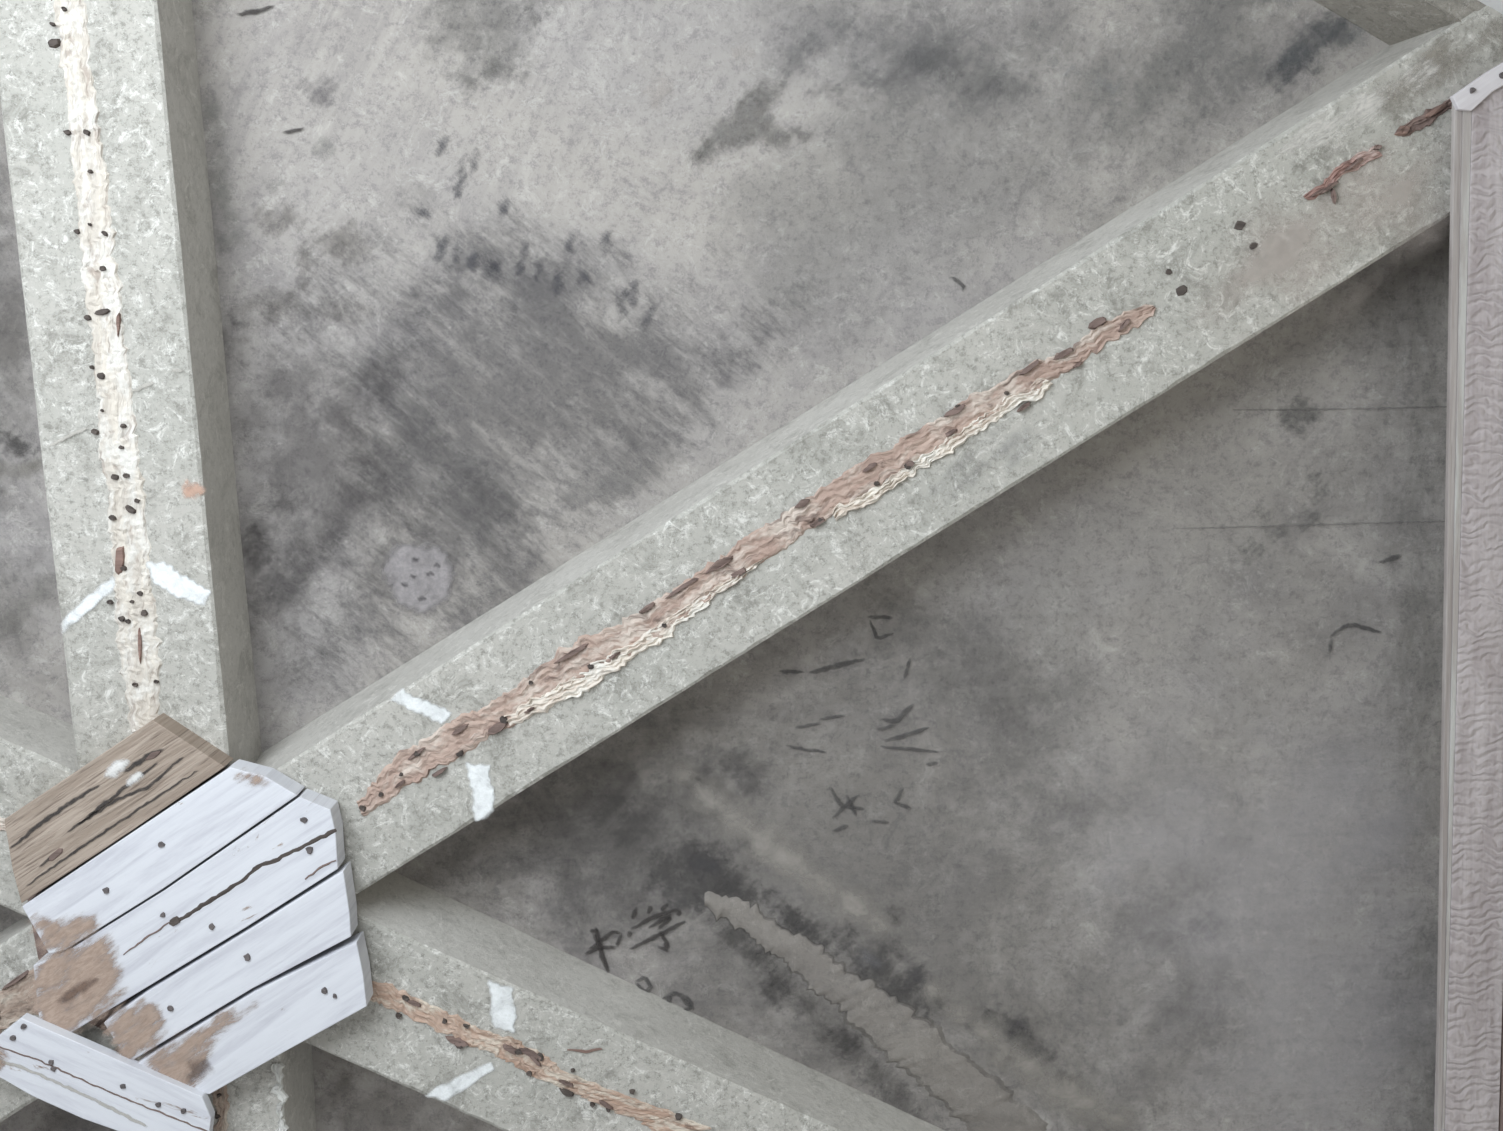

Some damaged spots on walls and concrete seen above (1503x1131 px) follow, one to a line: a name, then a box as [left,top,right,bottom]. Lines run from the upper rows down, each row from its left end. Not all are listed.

spalling [48,0,163,732]
spalling [357,304,1156,816]
spalling [1165,269,1187,296]